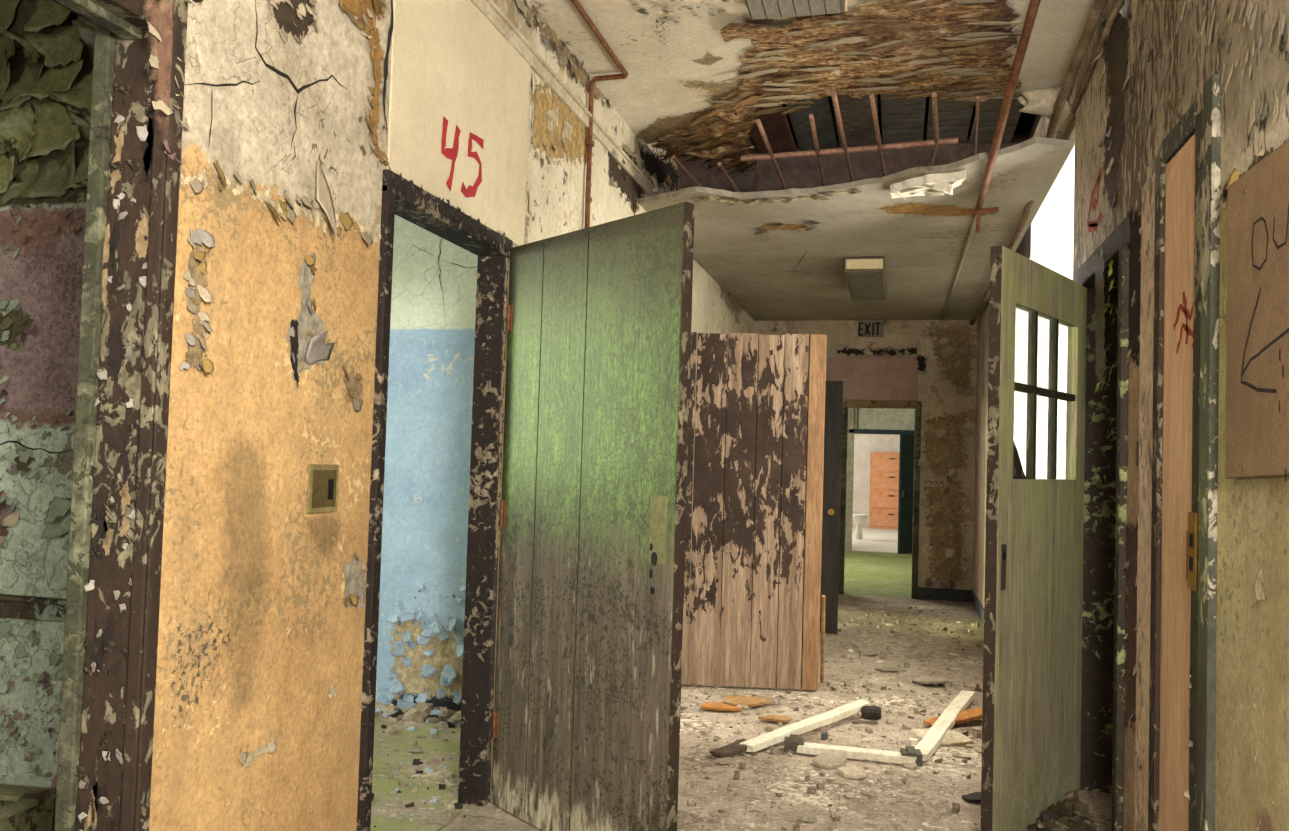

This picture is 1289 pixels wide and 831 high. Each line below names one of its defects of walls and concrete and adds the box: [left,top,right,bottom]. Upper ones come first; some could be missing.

crack [186,0,348,161]
crack [383,0,394,131]
flaking render [516,0,1071,215]
peeling [90,0,384,558]
peeling [0,365,76,432]
peeling [0,479,19,546]
peeling [2,449,40,481]
peeling [40,489,72,551]
peeling [82,578,132,678]
peeling [385,583,466,705]
peeling [74,726,123,831]